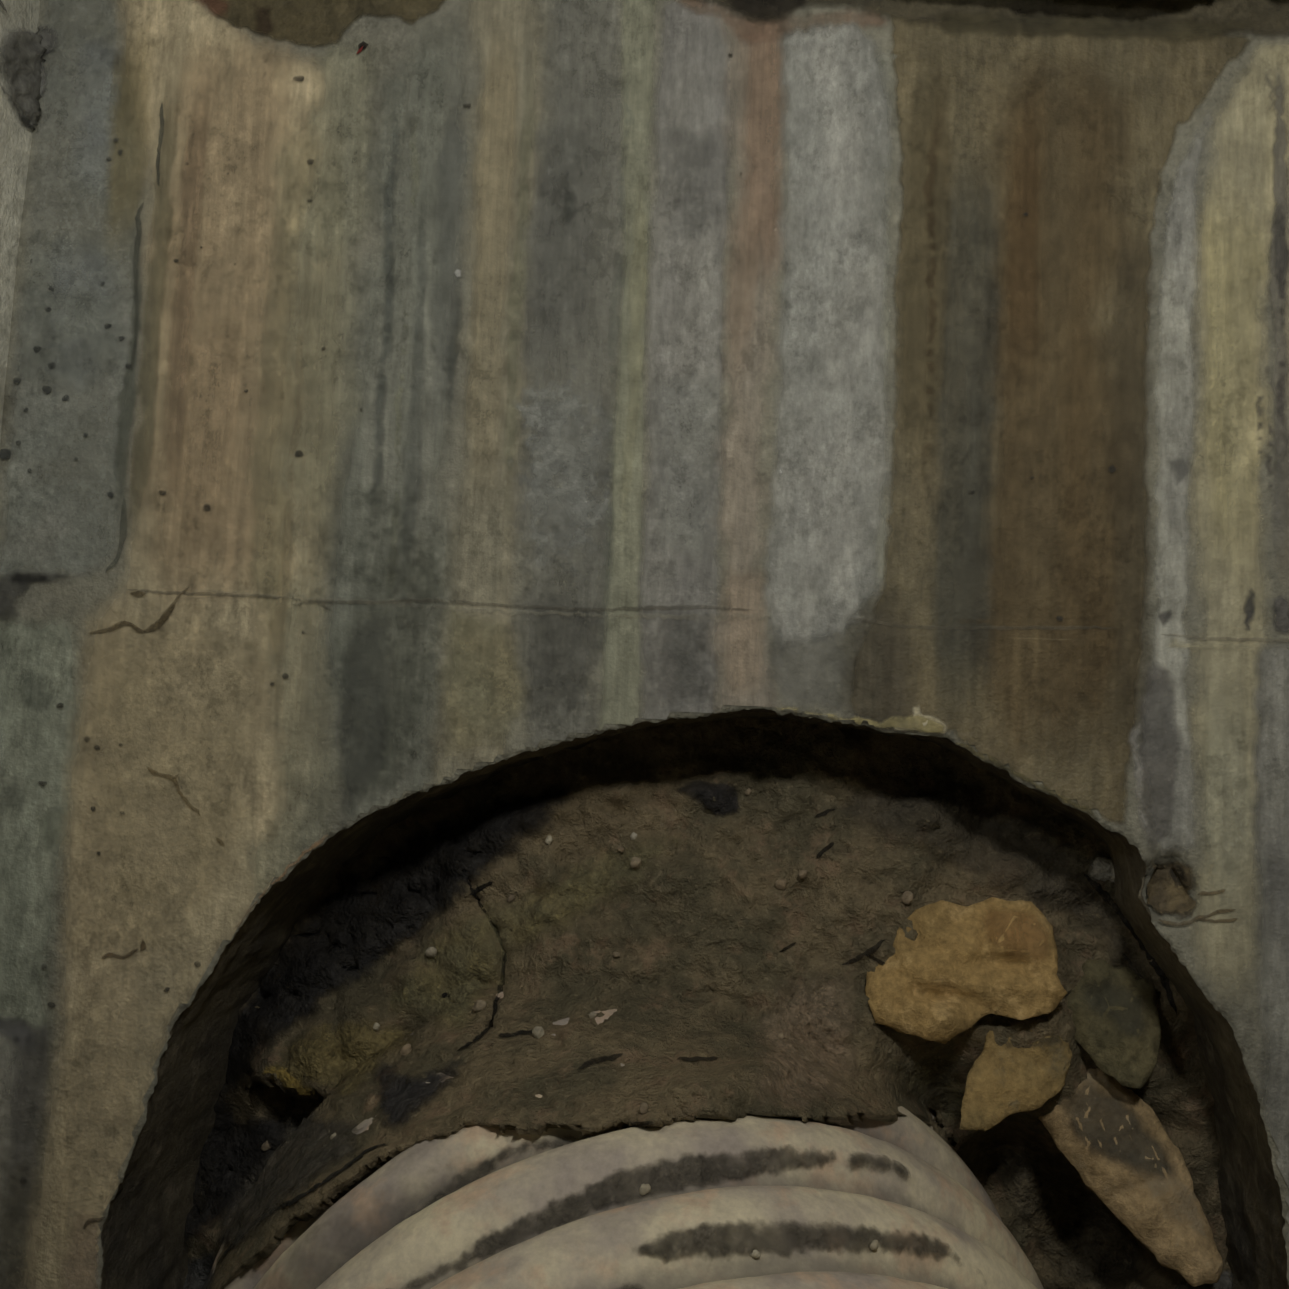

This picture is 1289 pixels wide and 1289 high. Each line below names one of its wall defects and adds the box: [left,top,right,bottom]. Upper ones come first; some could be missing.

water stain [200,0,444,536]
corrosion [682,0,788,707]
crack [147,767,225,846]
water stain [255,616,330,888]
spalling [782,707,946,732]
water stain [519,0,1289,1242]
spalling [1147,862,1197,914]
water stain [265,1023,410,1096]